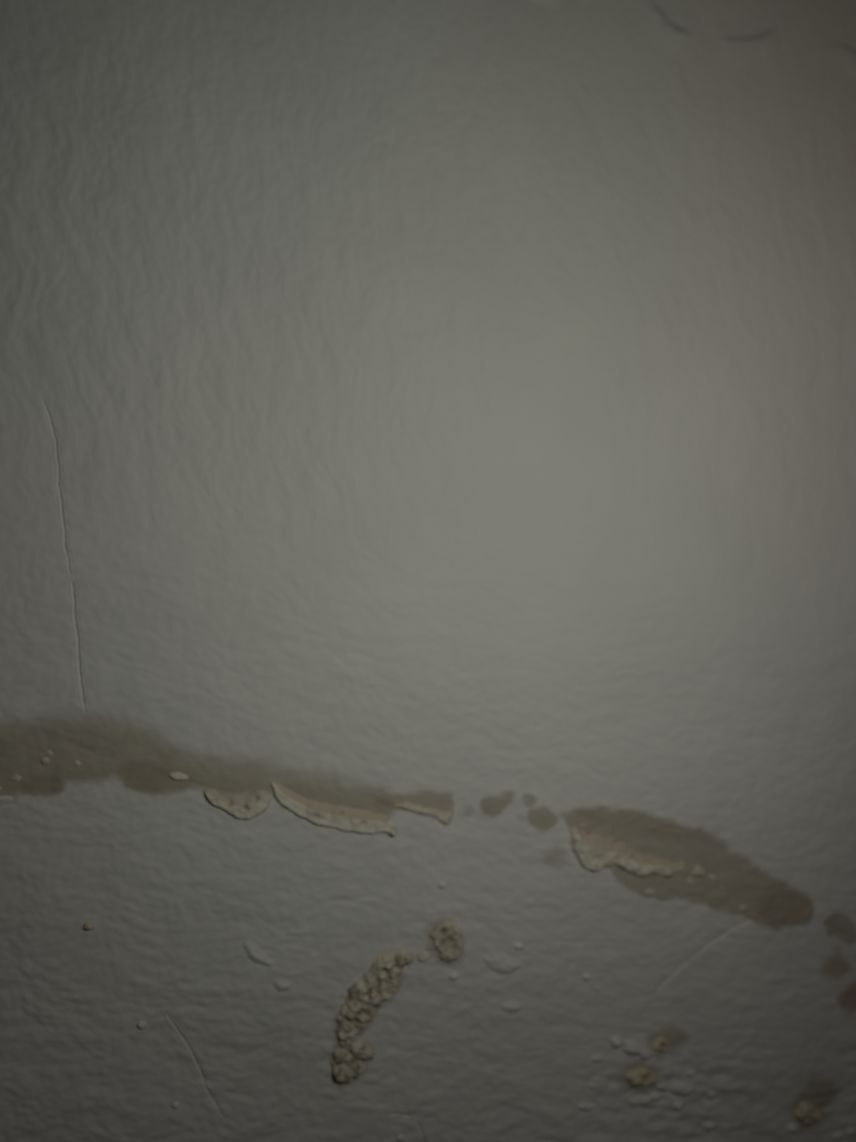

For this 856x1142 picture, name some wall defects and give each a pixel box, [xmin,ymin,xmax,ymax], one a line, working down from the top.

damp [0,726,450,814]
damp [530,810,812,928]